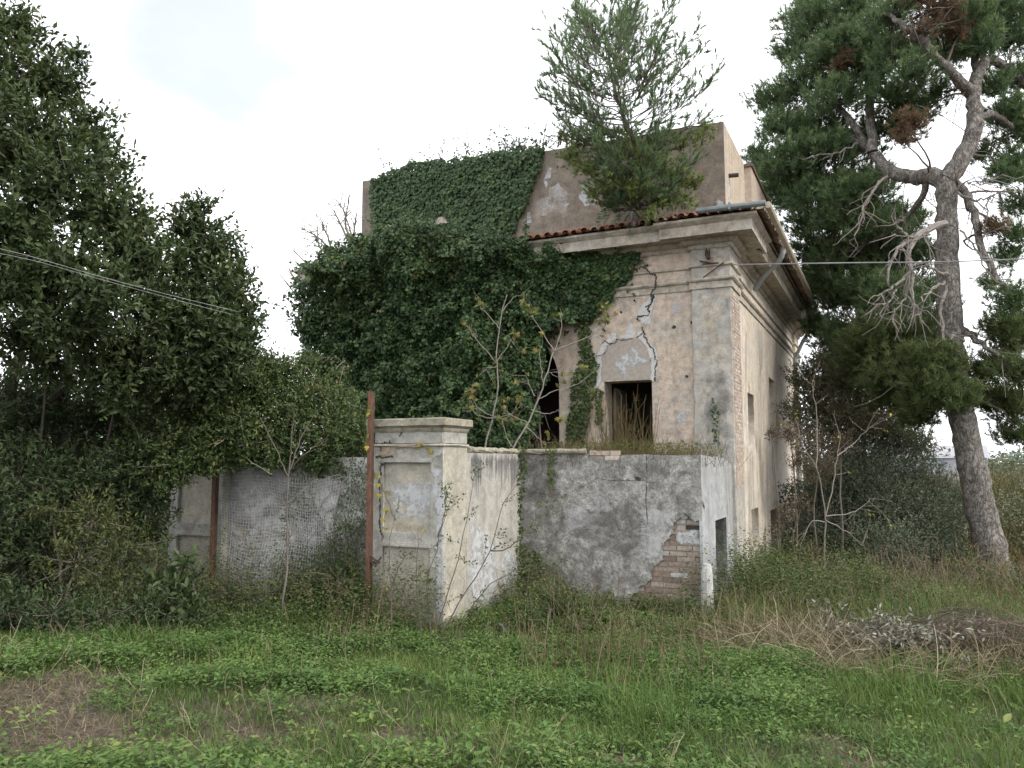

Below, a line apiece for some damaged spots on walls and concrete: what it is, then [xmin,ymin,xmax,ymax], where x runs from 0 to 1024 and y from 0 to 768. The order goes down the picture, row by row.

peeling [544,168,598,209]
peeling [592,294,658,388]
crack [595,266,658,382]
spalling [629,509,701,613]